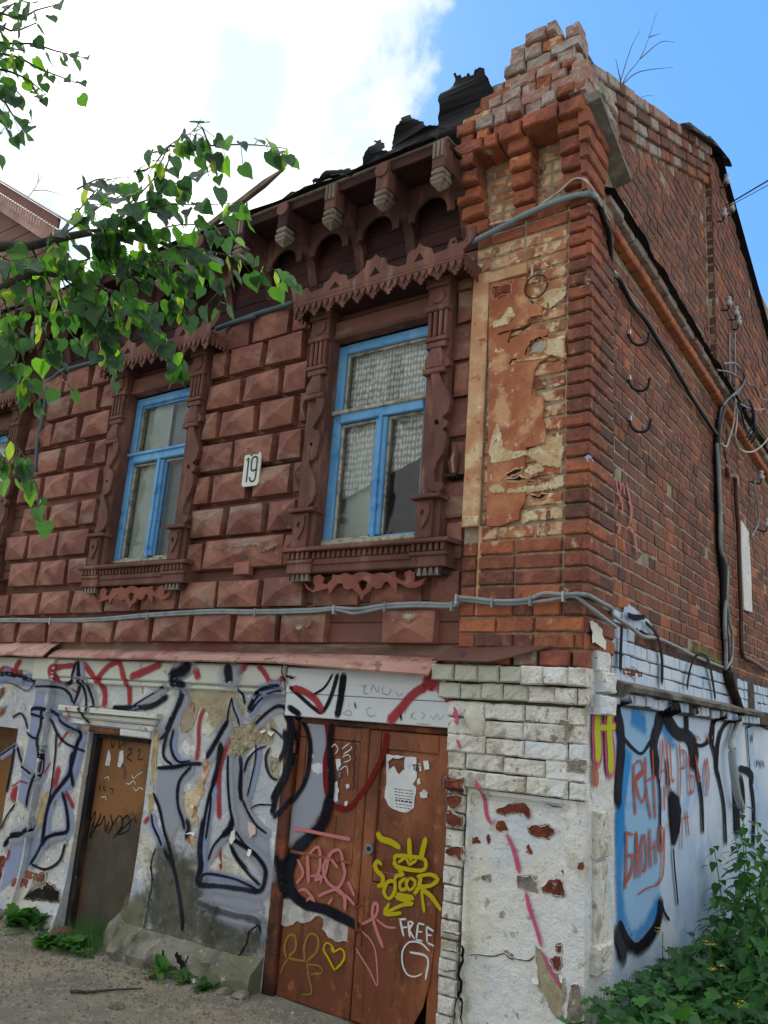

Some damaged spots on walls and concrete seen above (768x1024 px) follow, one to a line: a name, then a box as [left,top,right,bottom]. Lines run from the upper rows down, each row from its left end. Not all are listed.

peeling [527,287,566,308]
peeling [511,335,567,361]
peeling [488,424,565,524]
flaking render [179,689,281,779]
peeling [181,759,212,846]
spalling [443,776,466,828]
spalling [445,800,556,862]
flaking render [23,871,61,903]
spalling [516,870,566,898]
flaking render [531,943,585,1023]